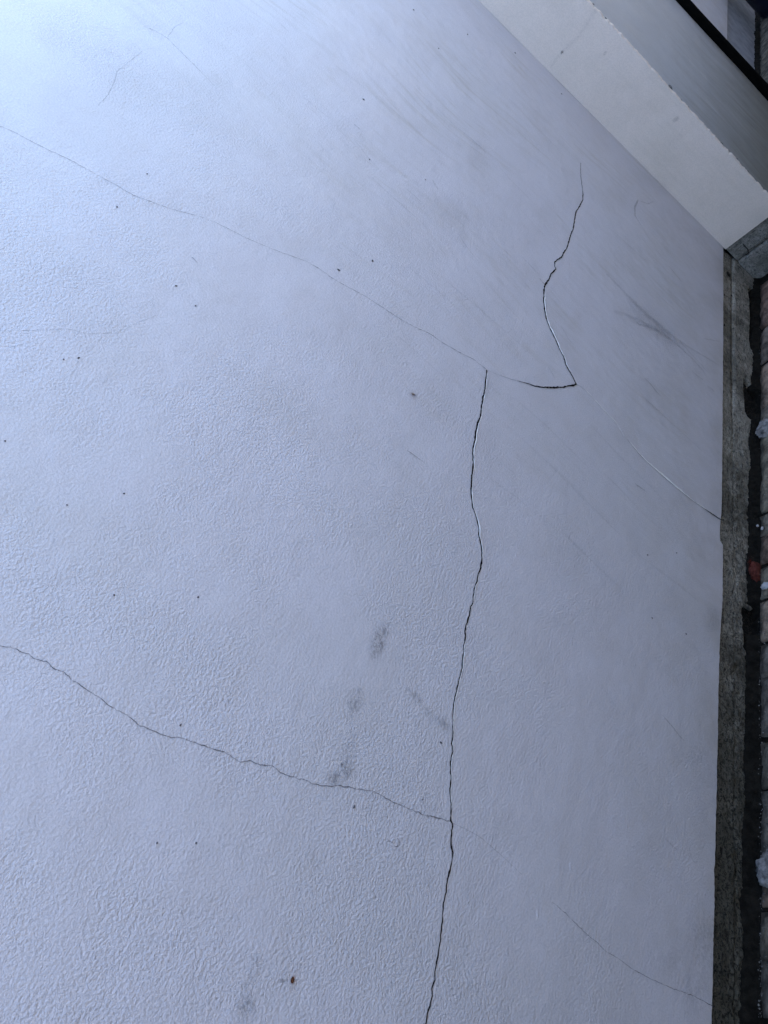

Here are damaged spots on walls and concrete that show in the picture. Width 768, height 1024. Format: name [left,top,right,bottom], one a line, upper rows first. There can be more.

crack [2,303,488,1024]
crack [520,168,721,520]